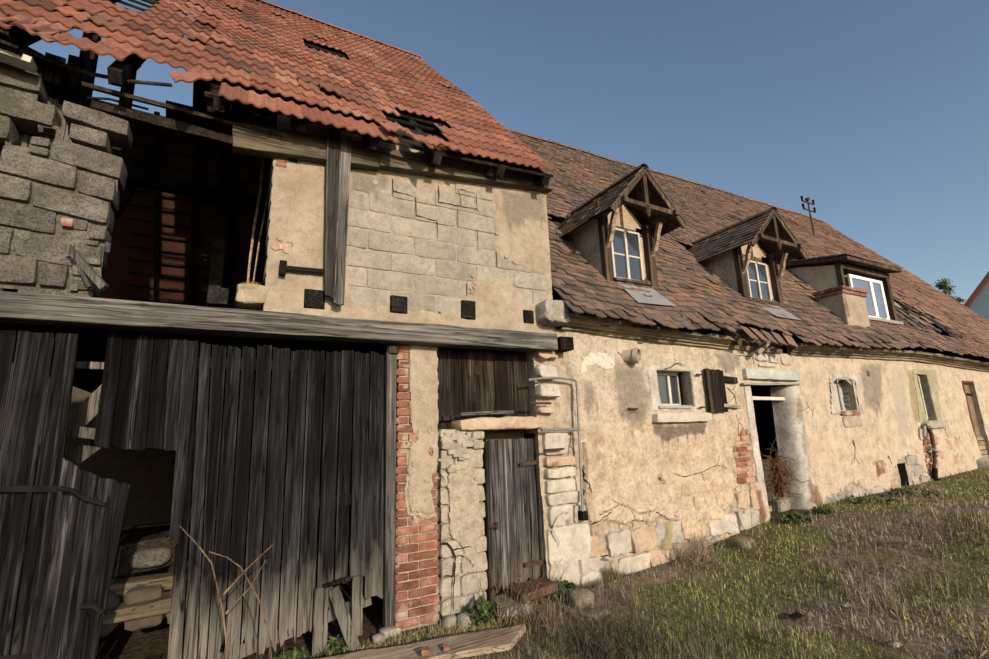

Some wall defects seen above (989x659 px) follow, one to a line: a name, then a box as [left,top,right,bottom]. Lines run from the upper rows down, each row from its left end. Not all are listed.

flaking render [346,171,548,316]
flaking render [405,430,437,519]
spalling [424,431,484,484]
crack [568,432,668,561]
flaking render [590,427,765,574]